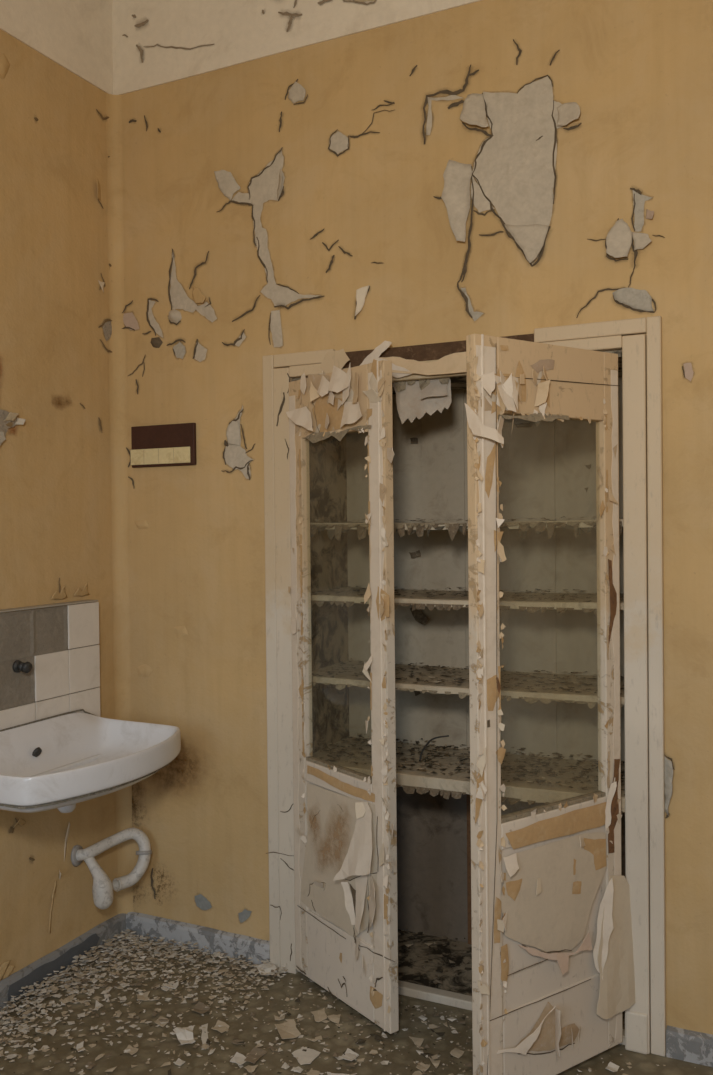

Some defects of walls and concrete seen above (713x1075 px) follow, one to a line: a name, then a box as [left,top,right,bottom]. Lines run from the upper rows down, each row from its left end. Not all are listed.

peeling [278,0,302,32]
peeling [279,79,308,132]
peeling [328,102,394,157]
peeling [422,65,582,321]
peeling [214,147,324,347]
peeling [576,188,665,318]
peeling [99,249,217,362]
peeling [0,409,26,445]
peeling [223,406,255,480]